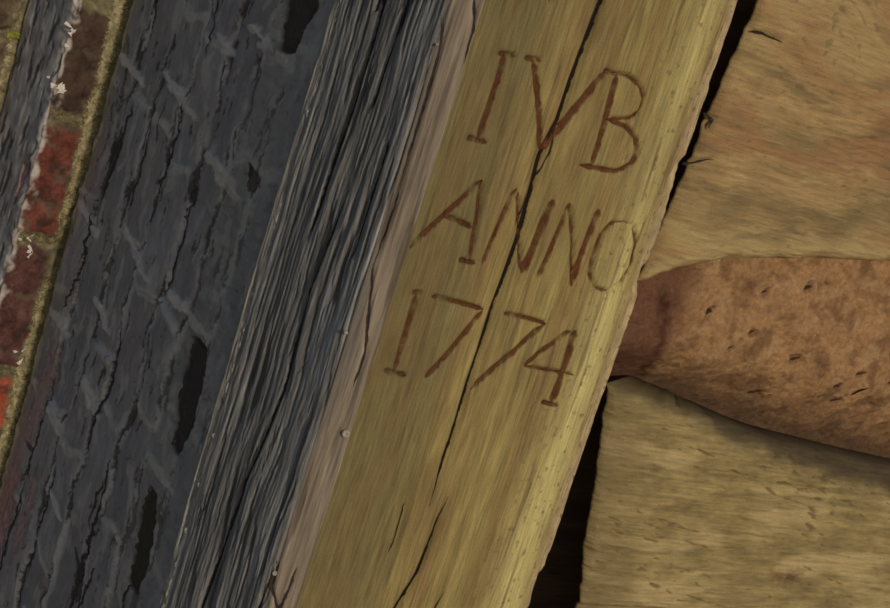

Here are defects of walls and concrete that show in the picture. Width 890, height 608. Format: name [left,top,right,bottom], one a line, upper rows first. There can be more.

crack [393,0,603,608]